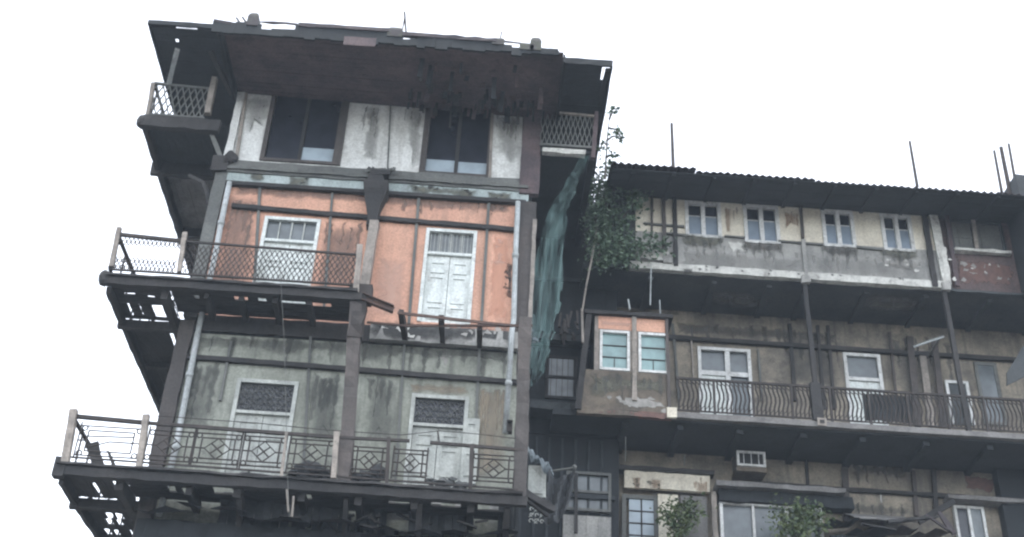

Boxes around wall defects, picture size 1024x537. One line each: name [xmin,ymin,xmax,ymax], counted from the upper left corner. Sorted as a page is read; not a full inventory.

water stain [683,235,723,247]
water stain [824,247,856,255]
water stain [881,249,916,259]
flaking render [941,246,1014,285]
peeling [600,396,666,419]